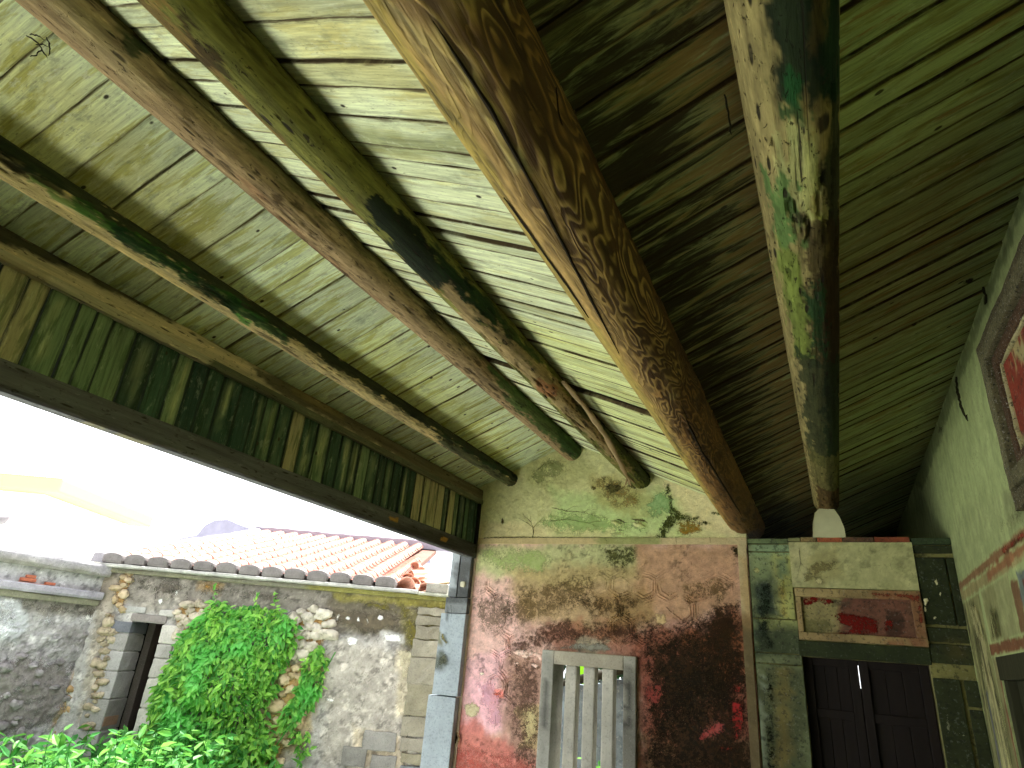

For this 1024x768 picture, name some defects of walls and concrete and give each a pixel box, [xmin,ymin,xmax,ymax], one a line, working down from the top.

leakage [591,478,638,507]
peeling [803,597,911,638]
peeling [871,580,941,624]
leakage [481,594,751,768]